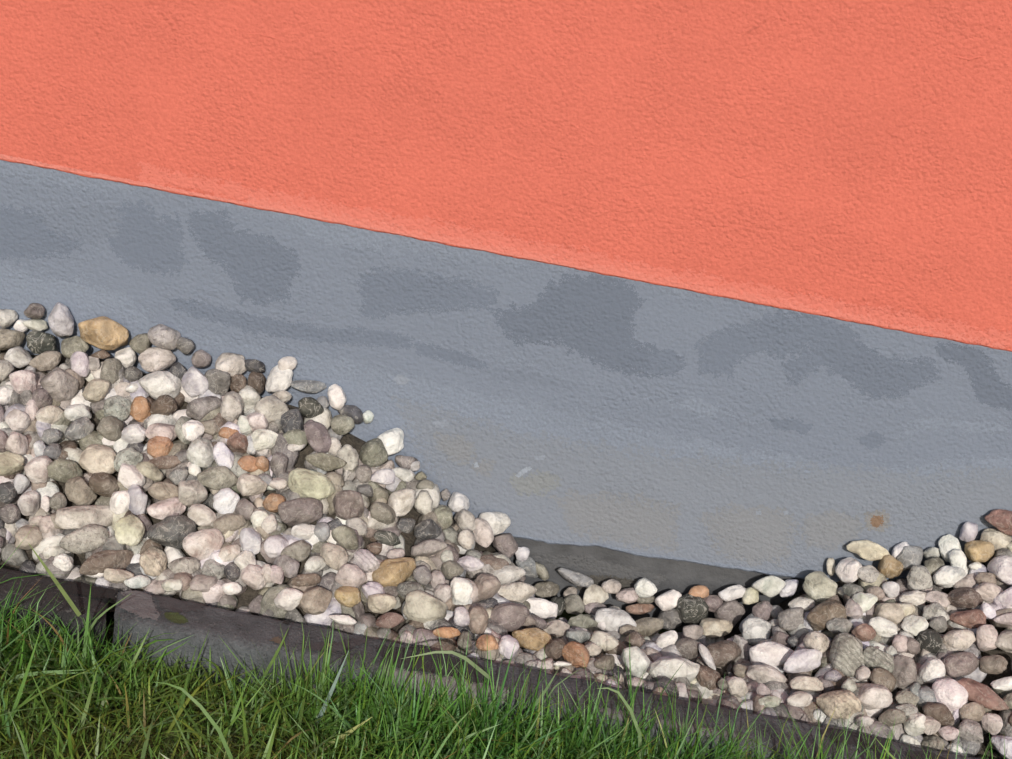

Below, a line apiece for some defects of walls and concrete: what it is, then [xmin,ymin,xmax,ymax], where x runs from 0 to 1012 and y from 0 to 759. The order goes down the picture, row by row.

leakage [0,173,1012,473]
rust [864,509,892,532]